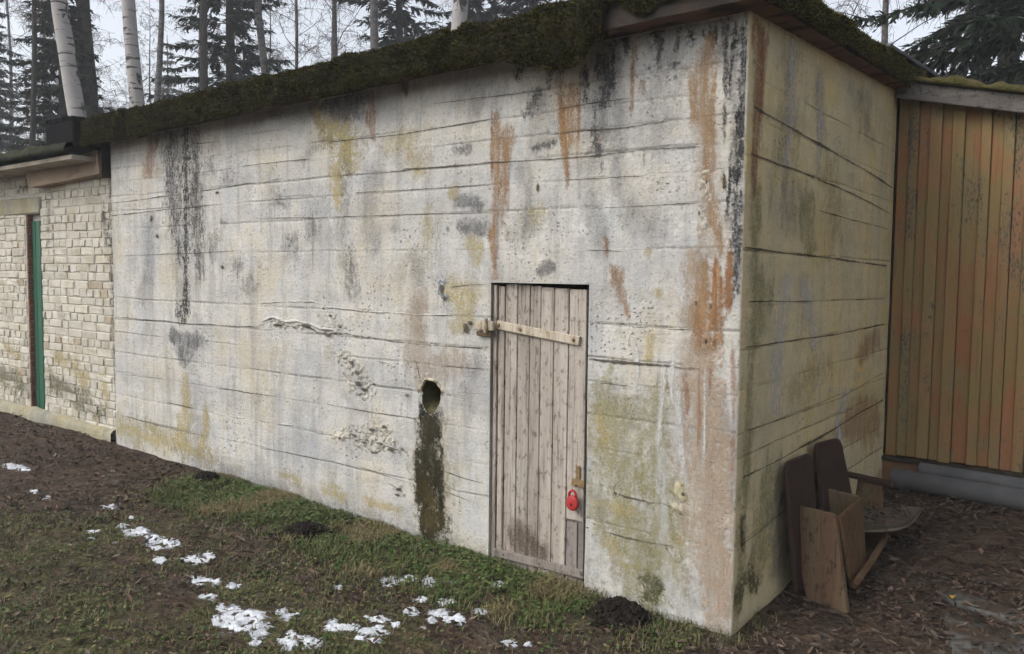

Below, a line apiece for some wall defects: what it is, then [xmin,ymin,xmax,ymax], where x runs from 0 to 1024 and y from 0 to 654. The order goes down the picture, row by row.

rust [488,112,513,270]
rust [557,80,581,179]
leakage [648,13,748,297]
leakage [116,127,236,476]
crack [114,318,484,394]
spalling [336,349,378,403]
spalling [331,418,408,456]
leakage [414,402,451,547]
rust [673,34,735,634]